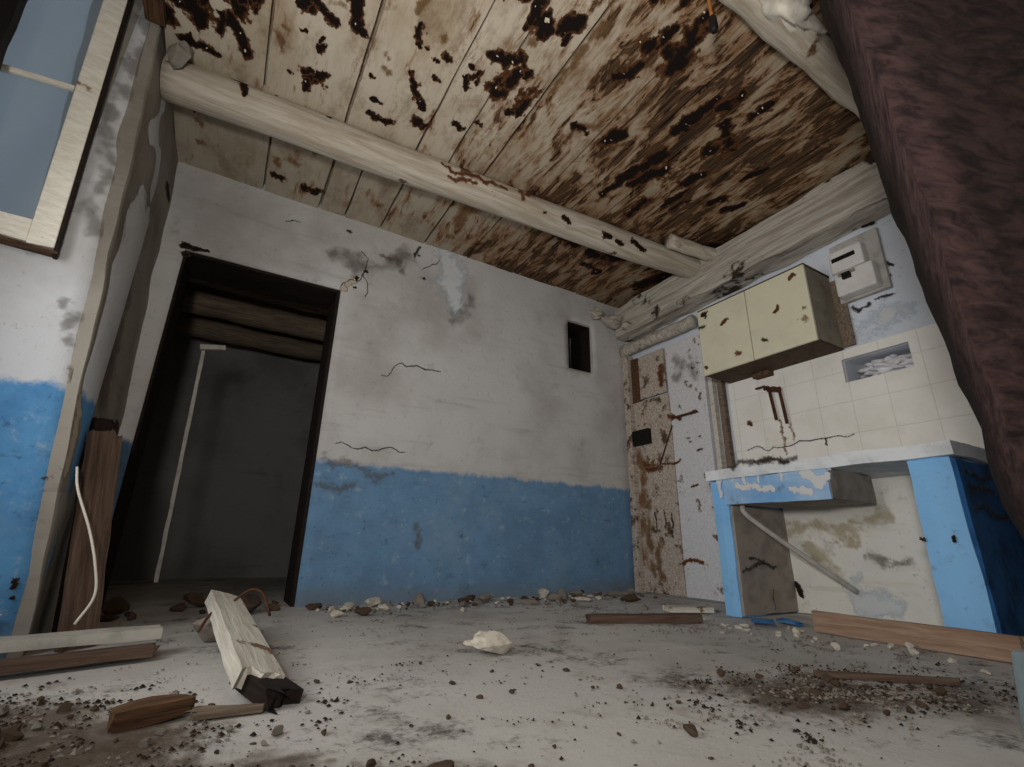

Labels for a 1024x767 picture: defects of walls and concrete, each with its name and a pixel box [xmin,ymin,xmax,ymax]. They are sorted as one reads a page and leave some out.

water stain [415,0,430,16]
water stain [275,25,290,52]
water stain [548,21,607,95]
corrosion [441,162,543,201]
water stain [448,205,476,239]
crack [381,363,441,377]
crack [336,442,404,453]
corrosion [644,458,681,473]
peeling [731,468,833,496]
flaking render [9,577,20,600]